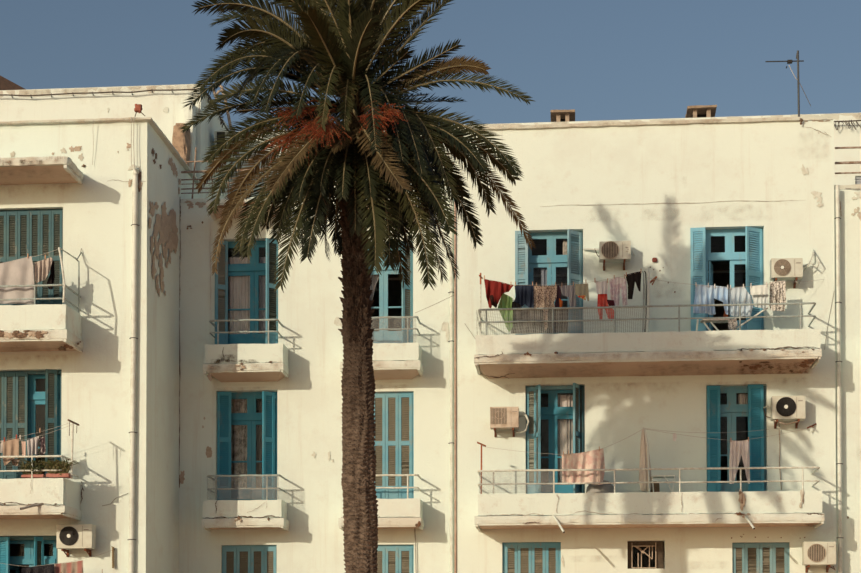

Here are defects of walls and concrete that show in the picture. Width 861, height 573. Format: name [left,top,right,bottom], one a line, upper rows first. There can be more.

peeling [52,146,86,167]
spalling [128,164,143,192]
peeling [151,149,206,209]
peeling [149,201,204,297]
spalling [0,330,48,339]